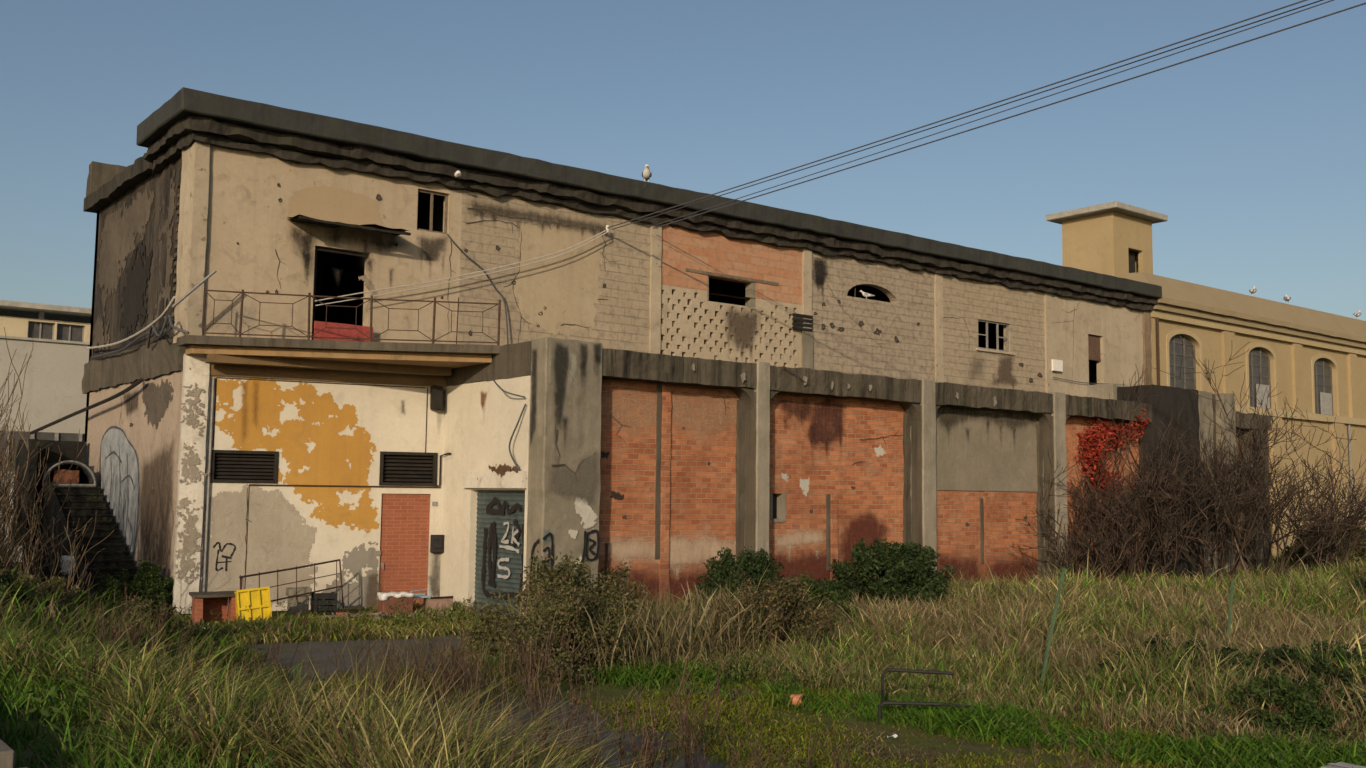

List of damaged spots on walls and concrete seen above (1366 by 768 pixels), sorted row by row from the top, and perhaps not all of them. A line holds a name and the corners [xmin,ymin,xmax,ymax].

water stain [554,344,600,435]
peeling [130,376,380,607]
spalling [568,497,598,584]
water stain [602,538,736,602]
water stain [773,514,887,585]